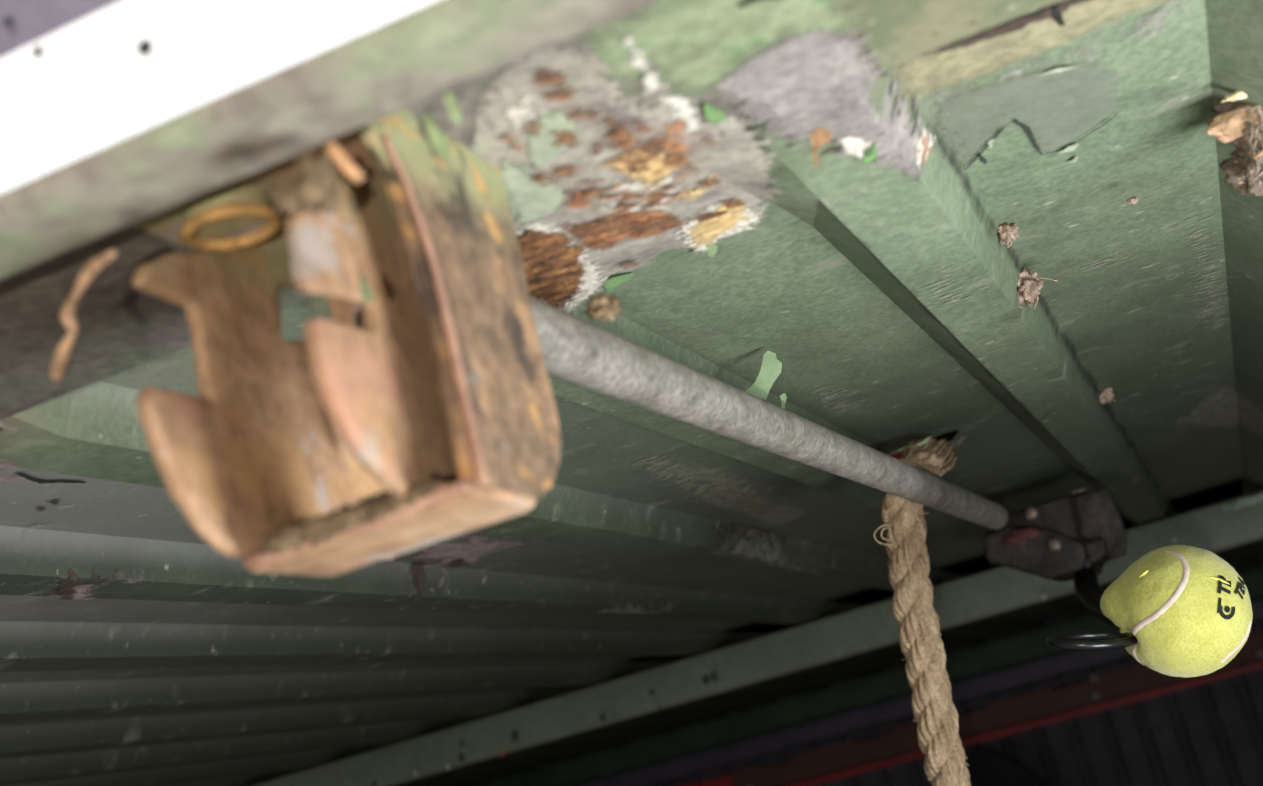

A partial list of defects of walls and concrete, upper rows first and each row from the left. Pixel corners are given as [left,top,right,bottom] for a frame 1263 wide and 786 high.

rust [459,44,783,315]
peeling [578,0,1118,184]